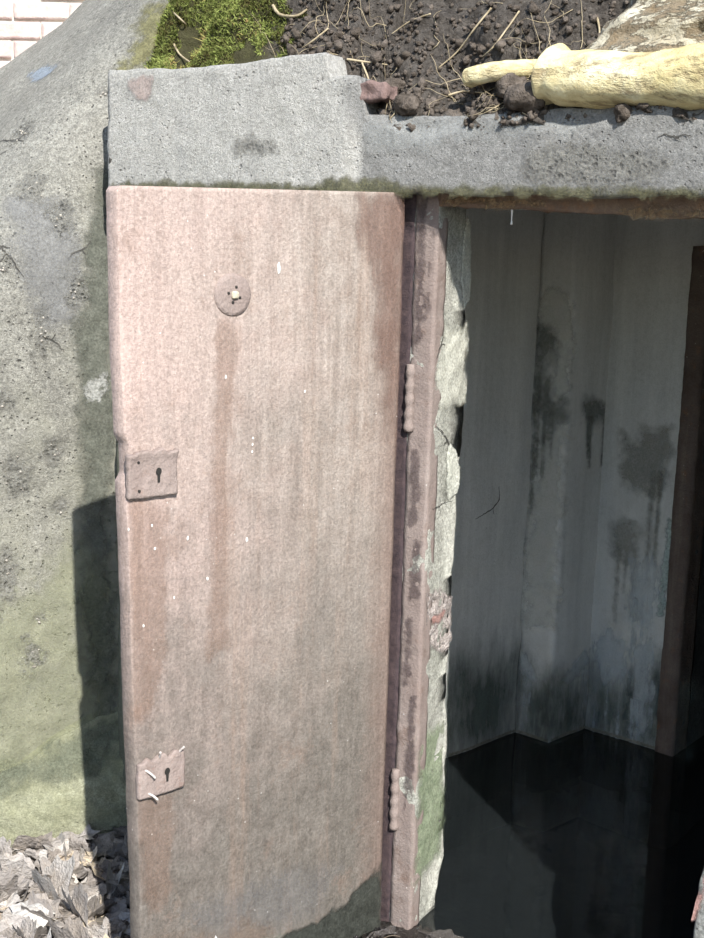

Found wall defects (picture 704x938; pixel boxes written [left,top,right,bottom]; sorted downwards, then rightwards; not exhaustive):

water stain [0,169,119,794]
water stain [530,325,568,503]
water stain [583,399,605,464]
water stain [622,430,670,512]
water stain [445,630,660,758]
corrosion [405,698,415,797]
water stain [283,871,382,938]